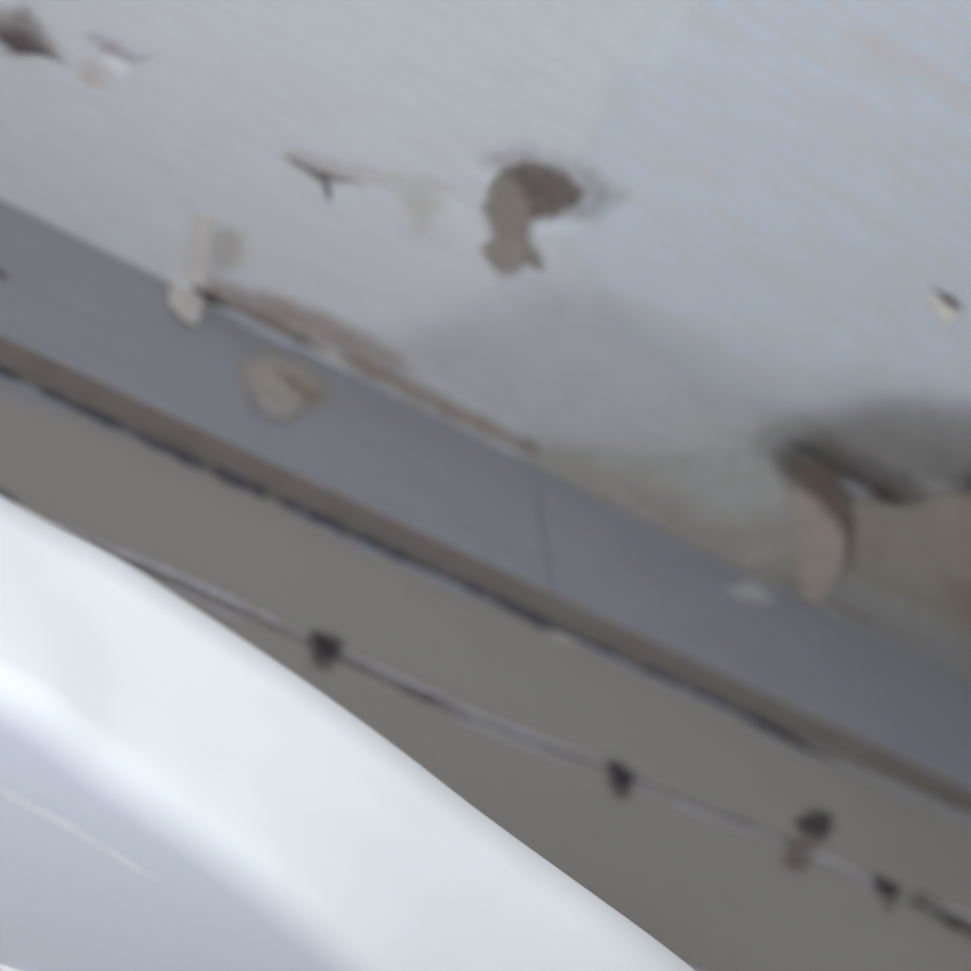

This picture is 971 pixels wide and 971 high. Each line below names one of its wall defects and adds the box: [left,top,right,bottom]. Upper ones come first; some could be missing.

peeling [168,211,253,326]
spalling [445,132,635,279]